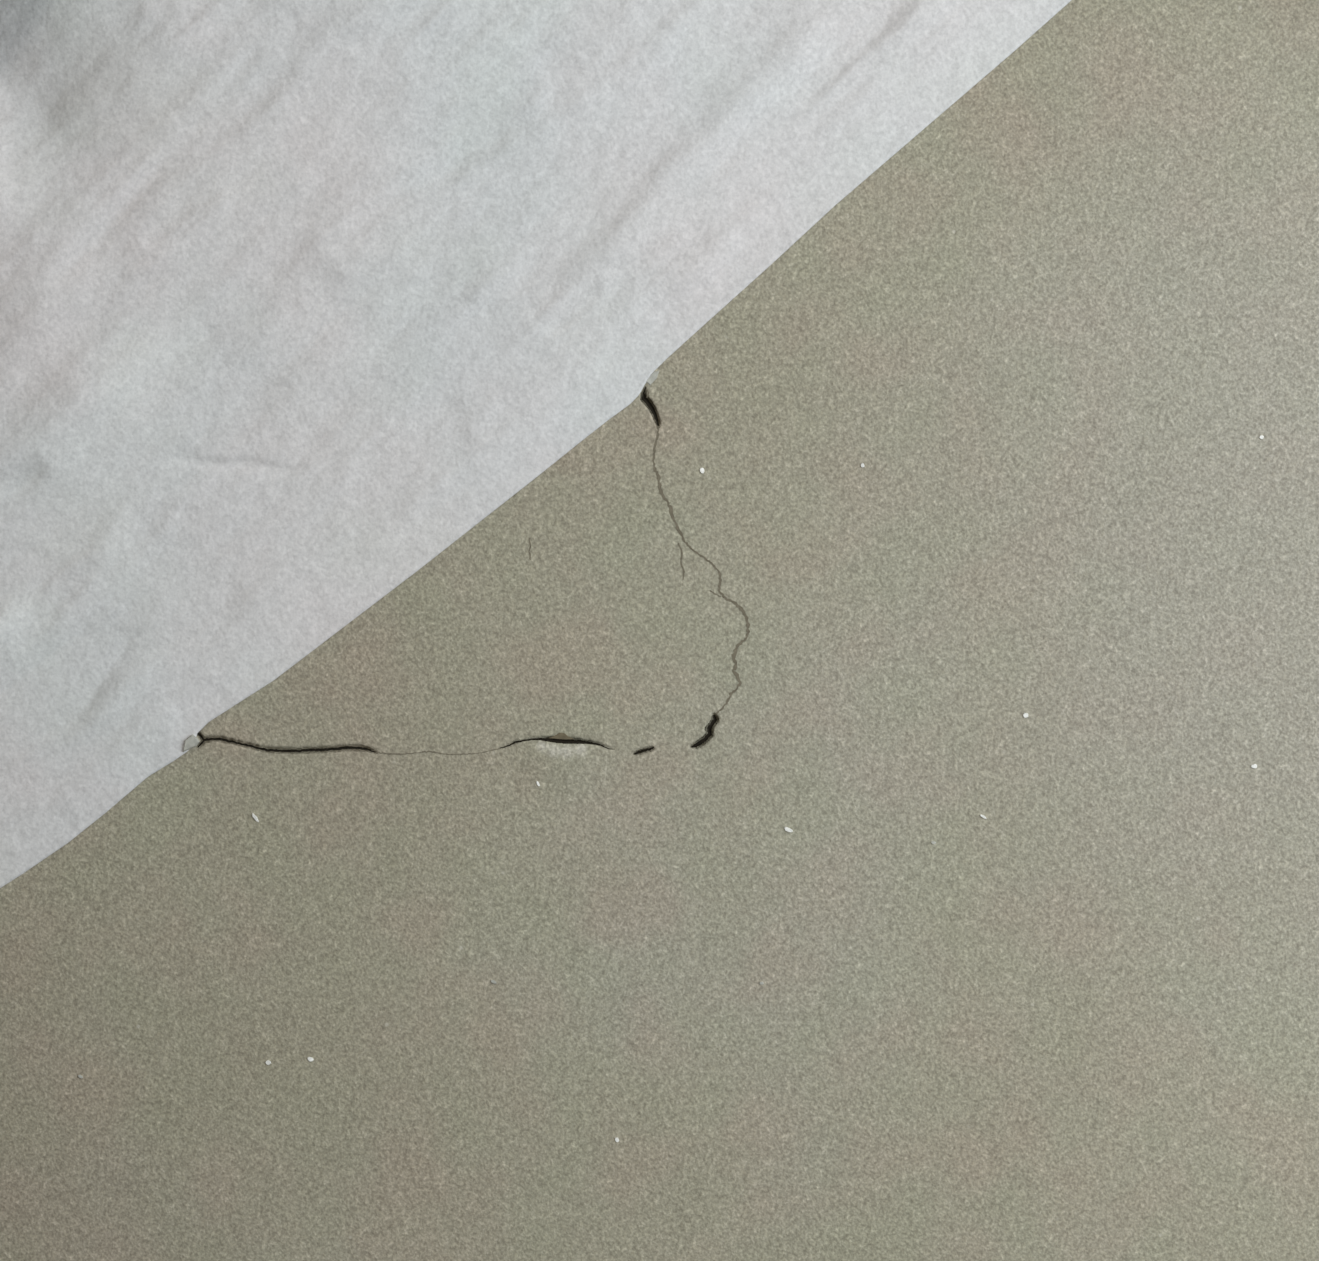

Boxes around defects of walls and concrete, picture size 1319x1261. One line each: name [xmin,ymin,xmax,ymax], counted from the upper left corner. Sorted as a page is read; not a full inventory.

crack [642,371,750,748]
crack [183,732,654,797]